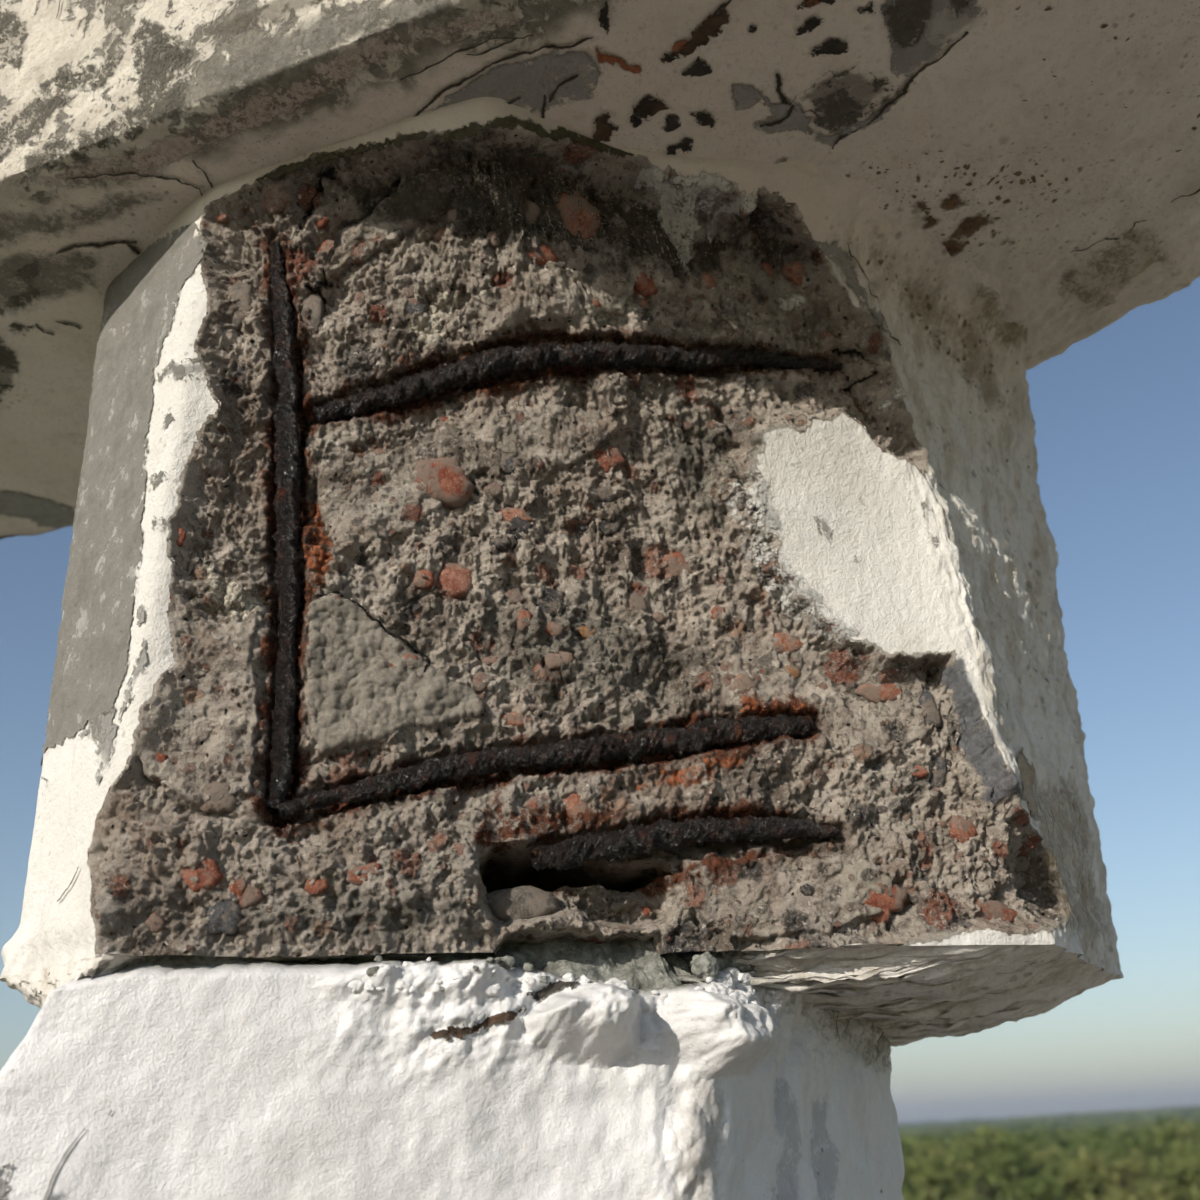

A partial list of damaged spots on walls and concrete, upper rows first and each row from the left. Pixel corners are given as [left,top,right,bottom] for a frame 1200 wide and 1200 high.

mould [0,1,28,70]
mould [0,19,192,171]
peeling [23,11,520,187]
water stain [219,0,447,79]
spalling [660,4,730,77]
peeling [731,0,987,147]
crack [298,167,335,233]
crack [305,177,400,315]
spalling [0,94,1072,1010]
rust [249,238,843,879]
crack [313,592,430,672]
rust [628,842,832,897]